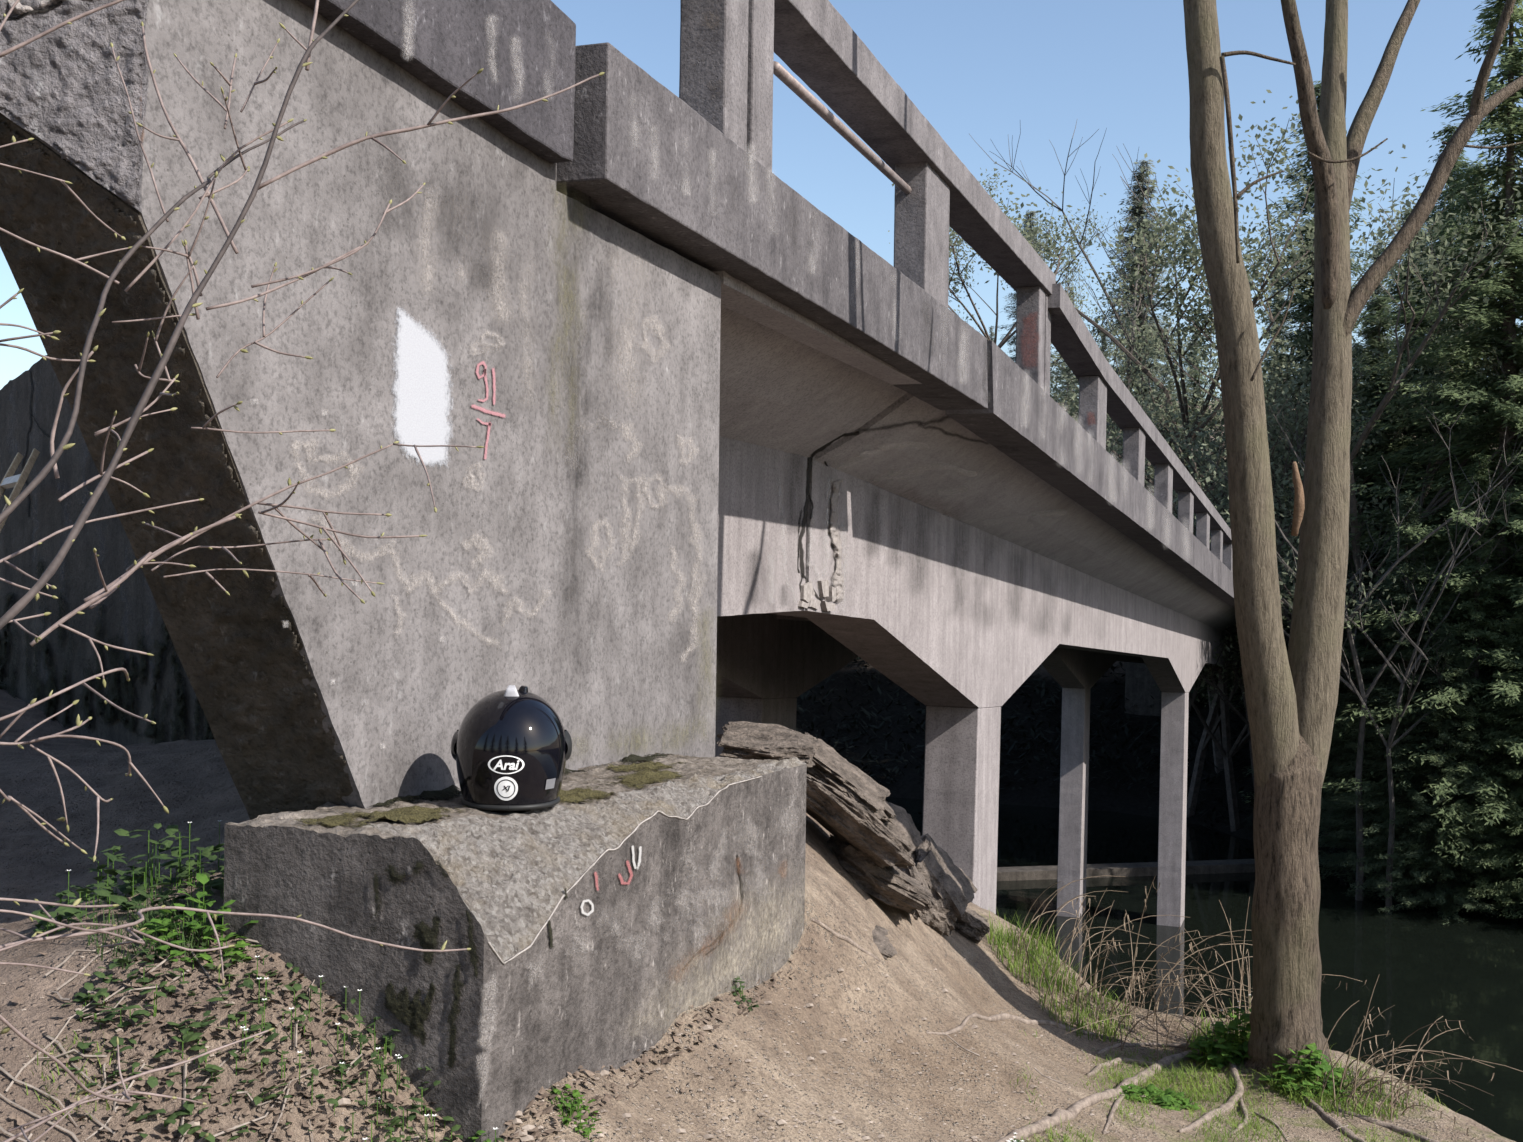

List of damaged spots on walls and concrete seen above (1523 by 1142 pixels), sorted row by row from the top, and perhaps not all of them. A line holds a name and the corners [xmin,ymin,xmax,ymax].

crack [797,416,987,601]